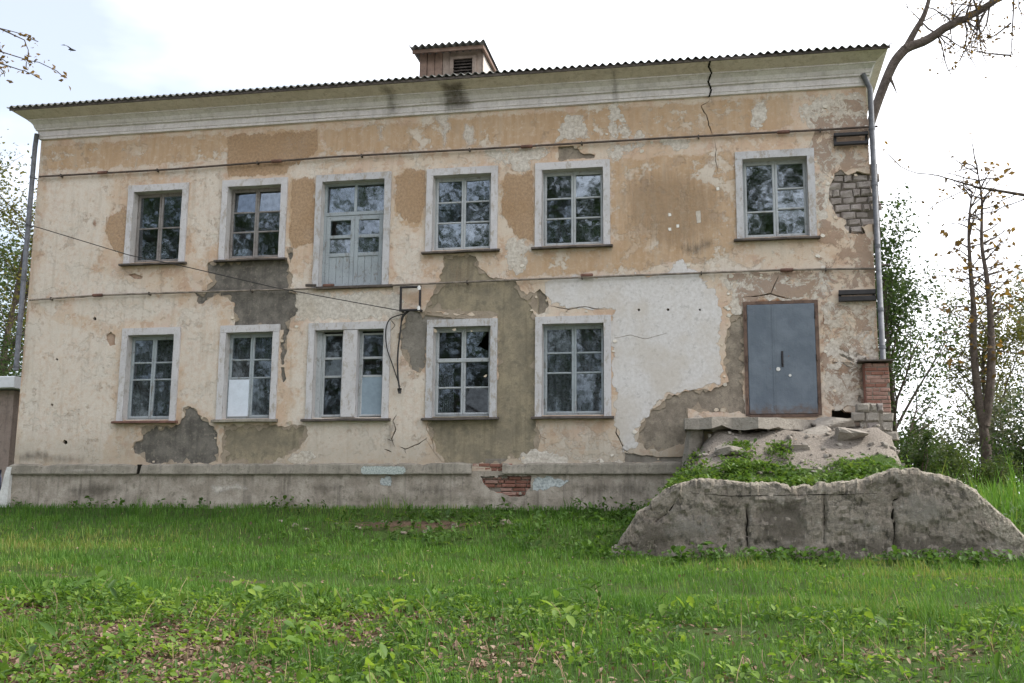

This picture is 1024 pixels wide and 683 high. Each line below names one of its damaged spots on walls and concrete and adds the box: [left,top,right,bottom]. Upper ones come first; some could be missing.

crack [701,61,717,165]
peeling [195,92,899,501]
spalling [131,406,316,464]
crack [655,493,869,546]